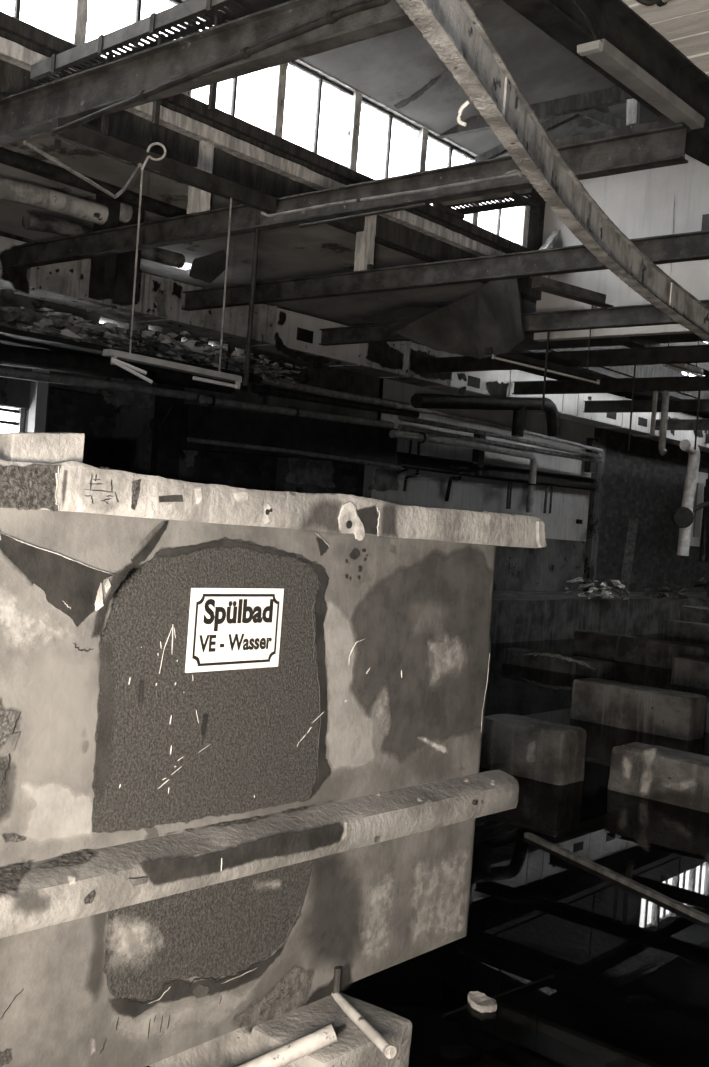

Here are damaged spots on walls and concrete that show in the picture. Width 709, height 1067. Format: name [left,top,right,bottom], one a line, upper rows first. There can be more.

peeling [0,701,20,817]
peeling [92,533,331,833]
leakage [351,513,493,761]
leakage [523,652,596,670]
peeling [104,859,313,1018]
peeling [0,1049,12,1067]